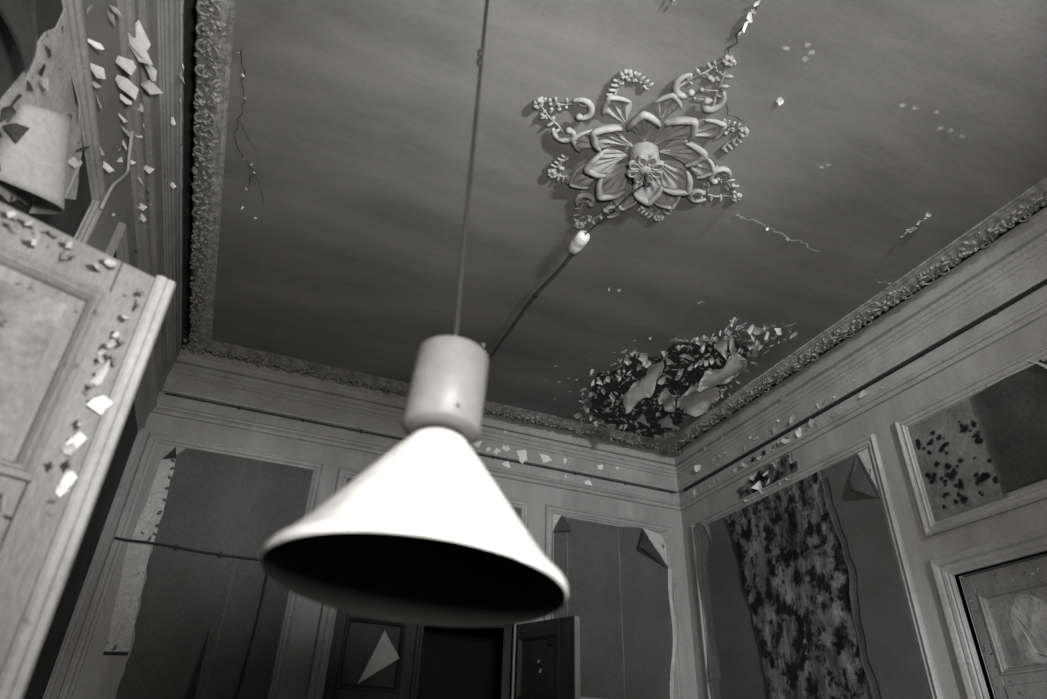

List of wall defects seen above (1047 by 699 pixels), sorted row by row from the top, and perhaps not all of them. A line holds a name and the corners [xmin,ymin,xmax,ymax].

peeling [107,5,123,27]
flaking render [0,9,82,200]
peeling [90,20,182,229]
crack [736,214,817,251]
peeling [84,288,144,415]
peeling [558,317,797,444]
peeling [43,419,87,498]
spalling [472,431,527,468]
peeling [733,396,838,502]